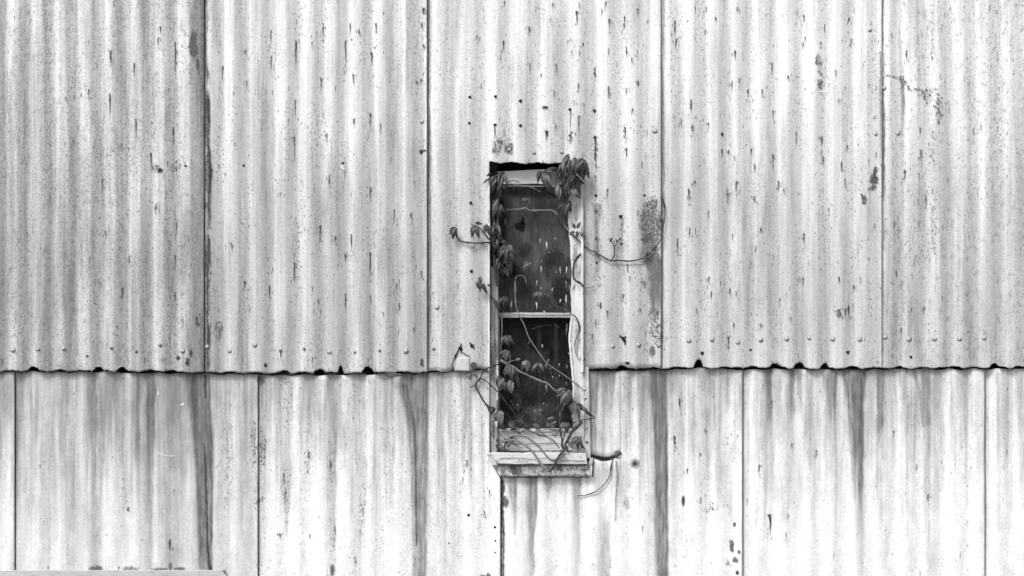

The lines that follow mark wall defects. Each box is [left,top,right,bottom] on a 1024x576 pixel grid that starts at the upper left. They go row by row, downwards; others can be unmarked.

corrosion [639,89,667,356]
corrosion [861,50,944,204]
damp [192,372,213,570]
damp [652,369,668,576]
damp [834,369,883,485]